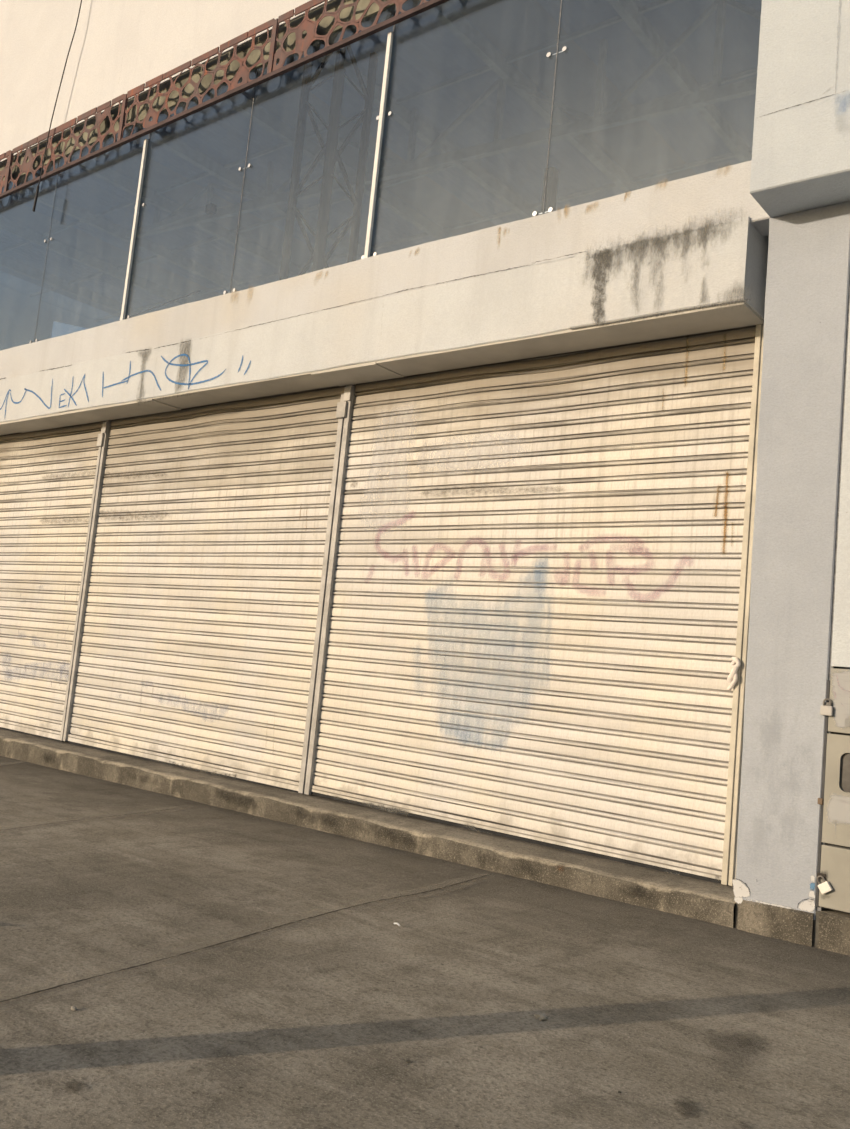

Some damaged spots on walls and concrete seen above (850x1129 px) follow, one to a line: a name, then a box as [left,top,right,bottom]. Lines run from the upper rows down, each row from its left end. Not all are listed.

leakage [592,223,715,325]
corrosion [715,473,729,549]
peeling [732,875,815,911]